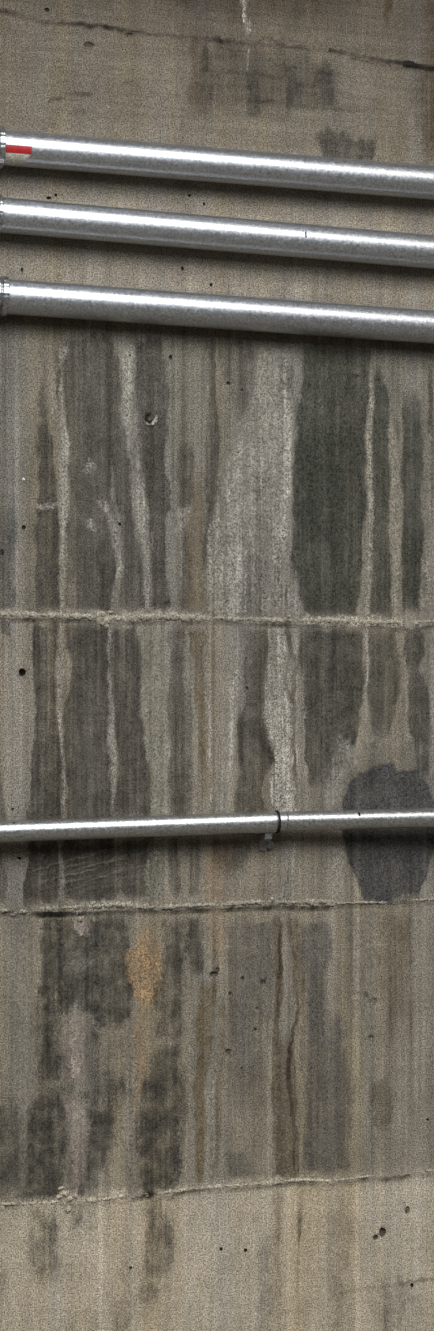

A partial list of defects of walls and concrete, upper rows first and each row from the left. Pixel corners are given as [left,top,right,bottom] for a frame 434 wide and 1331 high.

crack [75,21,124,30]
crack [387,59,434,70]
damp [36,337,185,608]
damp [188,344,433,615]
damp [27,625,191,820]
damp [209,626,429,812]
damp [0,838,203,1197]